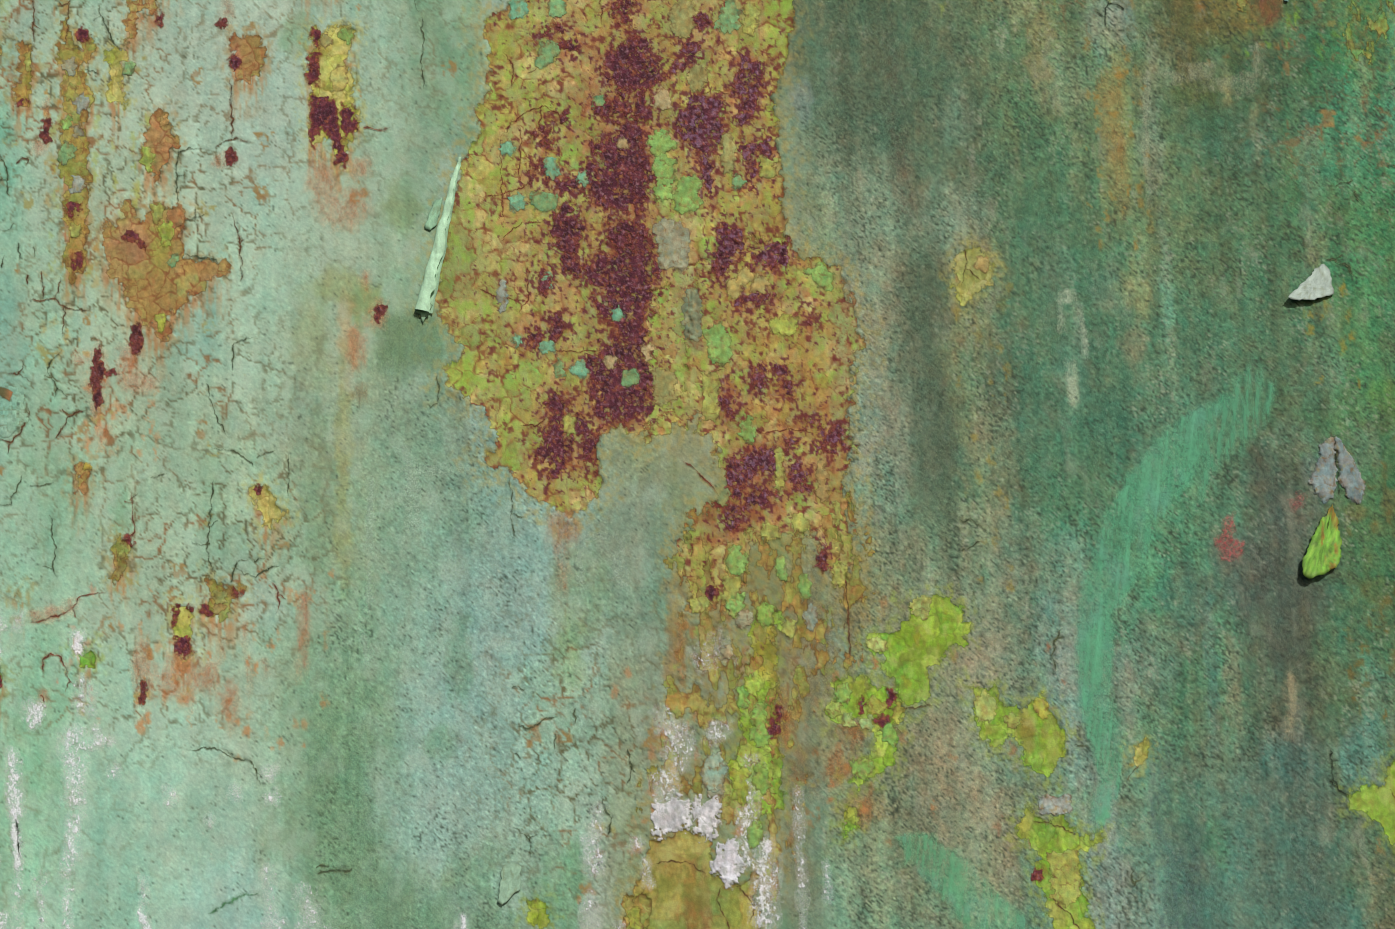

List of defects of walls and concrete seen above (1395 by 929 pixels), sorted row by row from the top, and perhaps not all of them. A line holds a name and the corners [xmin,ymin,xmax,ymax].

crack [32,1,114,44]
peeling [55,0,232,342]
crack [175,83,248,279]
peeling [304,24,362,169]
crack [0,157,87,505]
crack [207,337,289,492]
peeling [435,0,971,929]
crack [203,485,286,609]
leakage [652,708,693,800]
peeling [973,683,1103,929]
peeling [1349,761,1395,845]